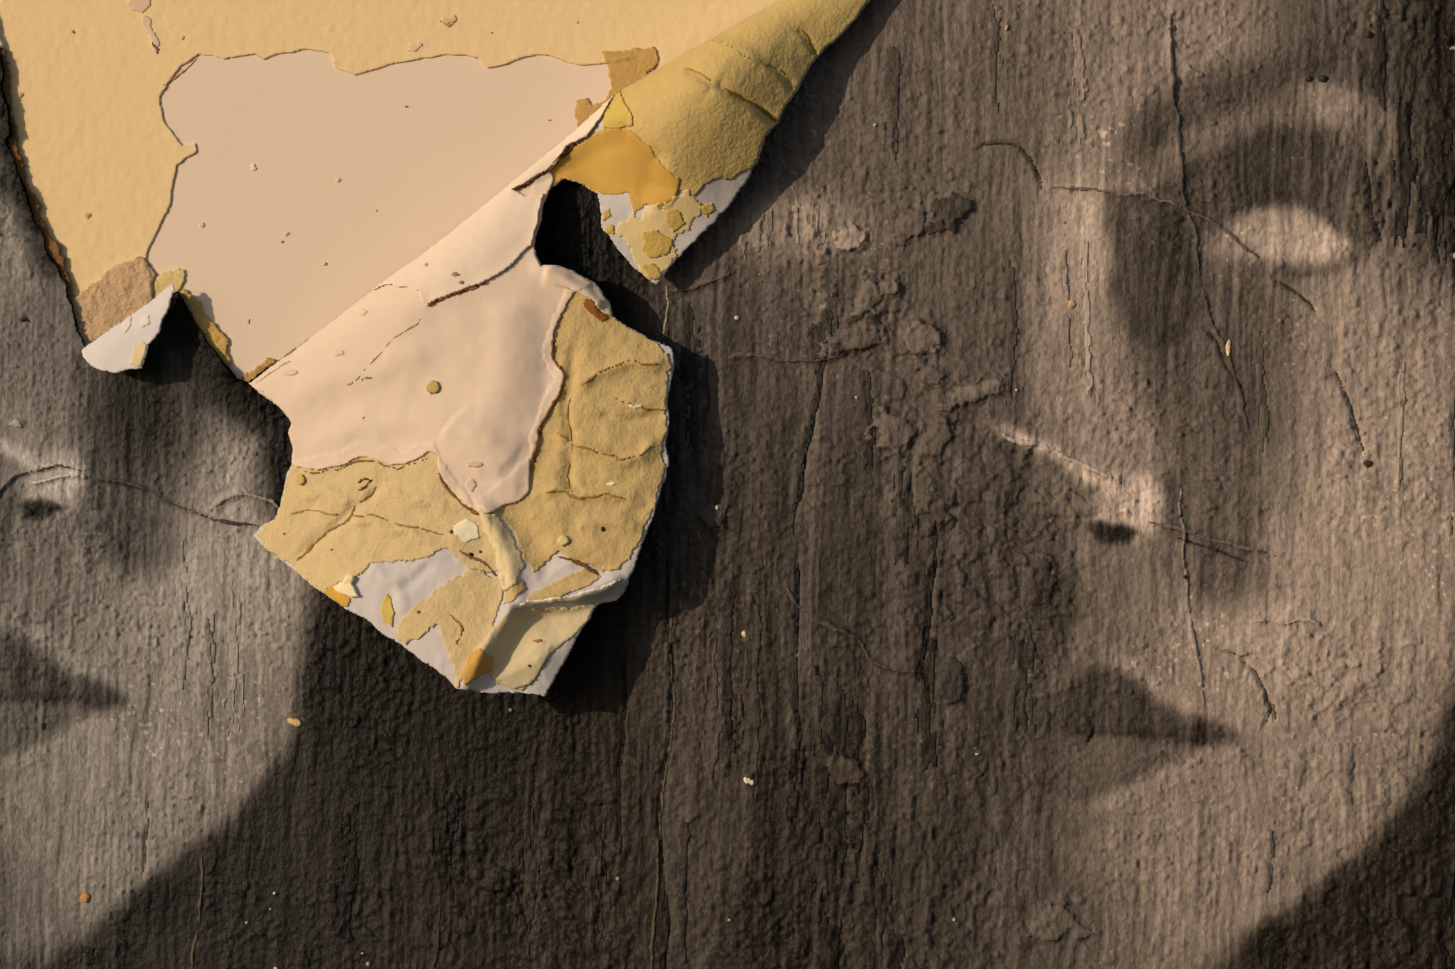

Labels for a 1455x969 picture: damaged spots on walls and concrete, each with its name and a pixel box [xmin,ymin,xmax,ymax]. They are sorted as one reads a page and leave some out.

spalling [127,0,160,51]
peeling [145,41,660,382]